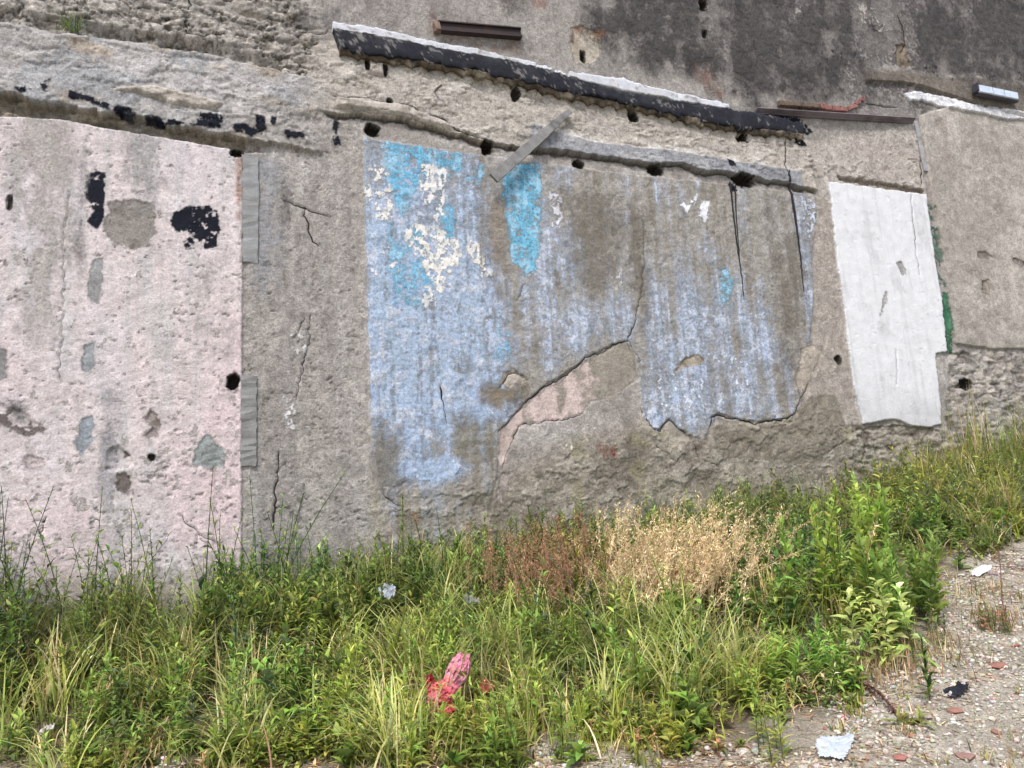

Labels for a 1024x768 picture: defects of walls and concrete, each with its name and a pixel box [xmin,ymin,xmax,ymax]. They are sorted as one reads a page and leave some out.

damp [582,0,872,107]
damp [911,0,1024,92]
crack [283,200,329,246]
peeling [363,164,395,220]
peeling [404,164,492,309]
crack [296,315,311,397]
flaking render [473,343,637,508]
crack [498,234,645,468]
flaking render [657,354,705,415]
crack [272,453,285,528]